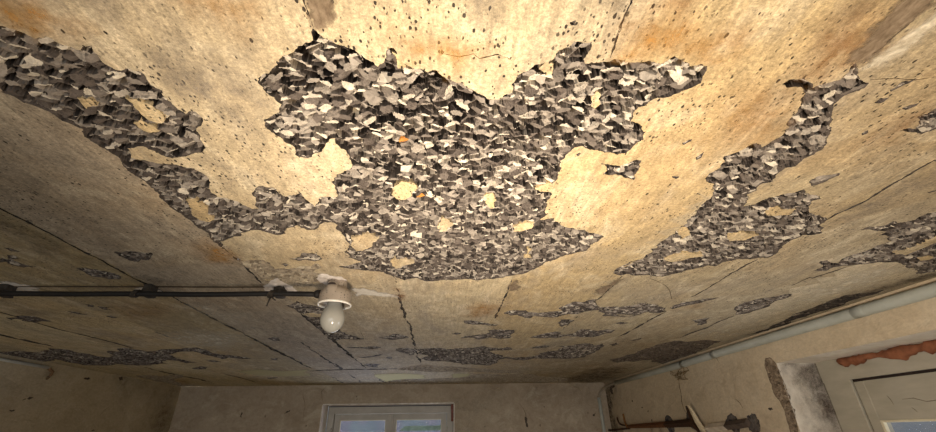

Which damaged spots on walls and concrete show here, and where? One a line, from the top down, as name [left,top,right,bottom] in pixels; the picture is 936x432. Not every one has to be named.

spalling [875,78,916,103]
spalling [900,103,936,134]
spalling [0,26,707,281]
spalling [614,63,869,277]
spalling [234,253,322,287]
spalling [815,212,936,274]
spalling [286,297,721,385]